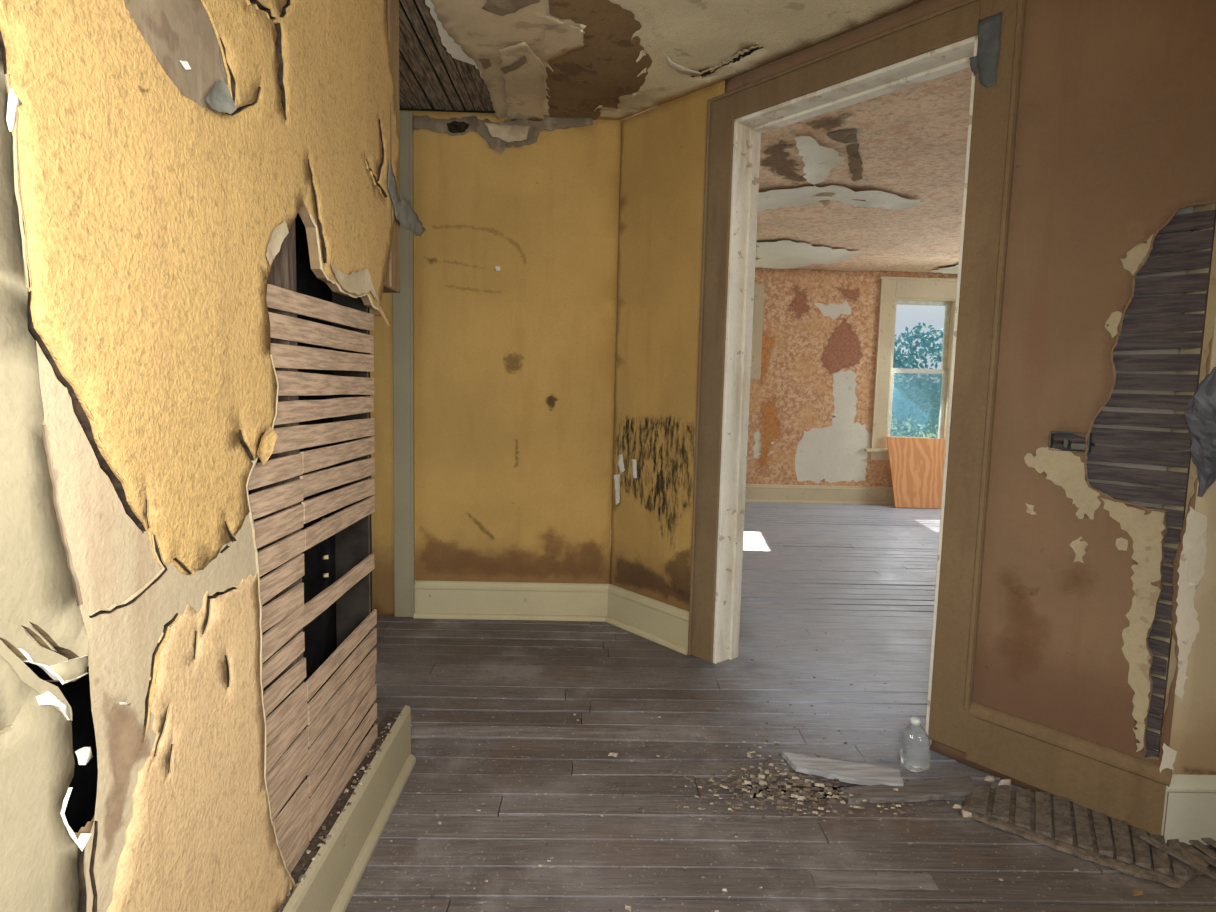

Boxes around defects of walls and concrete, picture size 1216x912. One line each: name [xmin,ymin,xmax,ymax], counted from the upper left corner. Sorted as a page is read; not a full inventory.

peeling [6,88,22,131]
flaking render [124,0,228,114]
crack [225,0,291,120]
flaking render [399,0,527,111]
flaking render [846,144,863,181]
flaking render [814,300,851,320]
crack [0,1,237,773]
damp [617,417,694,536]
flaking render [795,370,870,483]
flaking render [1024,201,1216,773]
flaking render [17,214,379,912]
damp [617,553,690,601]